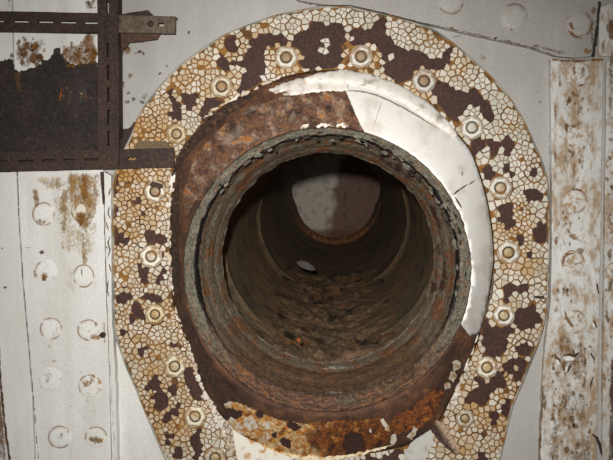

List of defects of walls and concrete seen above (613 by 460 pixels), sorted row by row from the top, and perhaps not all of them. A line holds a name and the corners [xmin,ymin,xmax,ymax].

rust [10,38,45,66]
rust [61,34,98,68]
crack [340,90,439,130]
rust [170,89,362,305]
crack [453,171,475,208]
rust [38,174,98,275]
peeling [113,7,549,460]
crack [485,273,494,314]
rust [552,336,591,387]
rust [183,312,444,457]
rust [543,385,585,430]